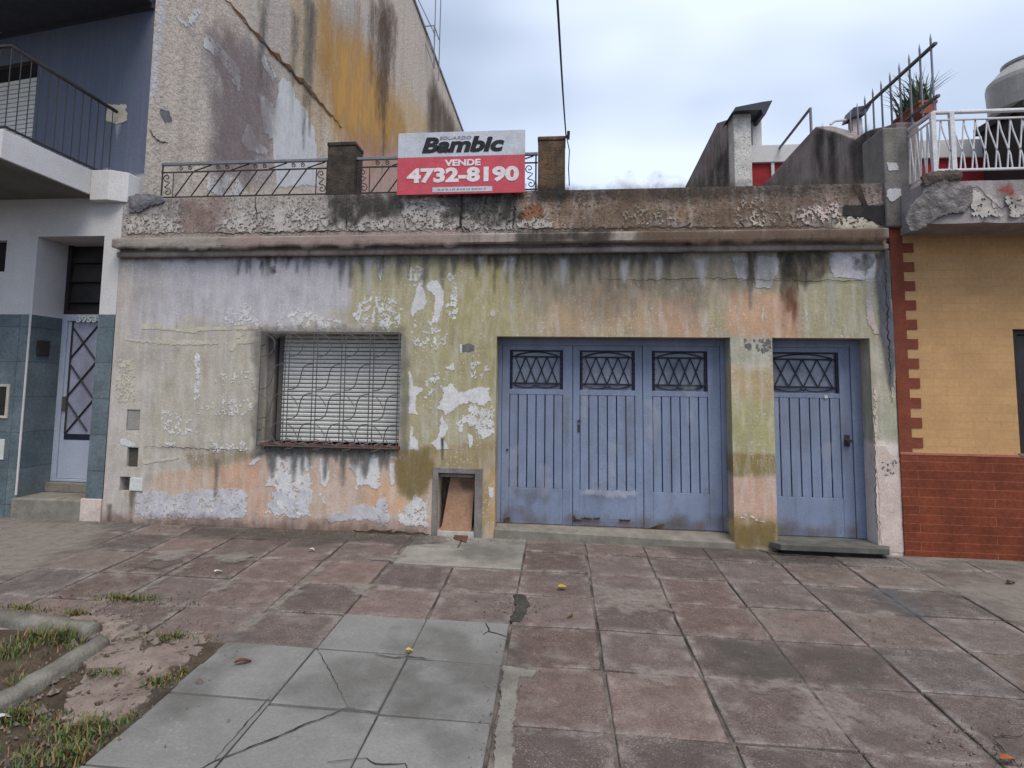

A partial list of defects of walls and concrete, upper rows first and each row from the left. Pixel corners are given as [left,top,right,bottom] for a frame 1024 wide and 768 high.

crack [225,0,342,128]
water stain [371,0,397,119]
peeling [117,193,553,248]
peeling [733,199,879,228]
spalling [905,169,1024,232]
water stain [309,255,462,282]
water stain [443,151,896,385]
peeling [210,440,330,519]
water stain [254,402,433,489]
peeling [326,343,495,528]
crack [202,648,381,768]
crack [328,757,408,768]